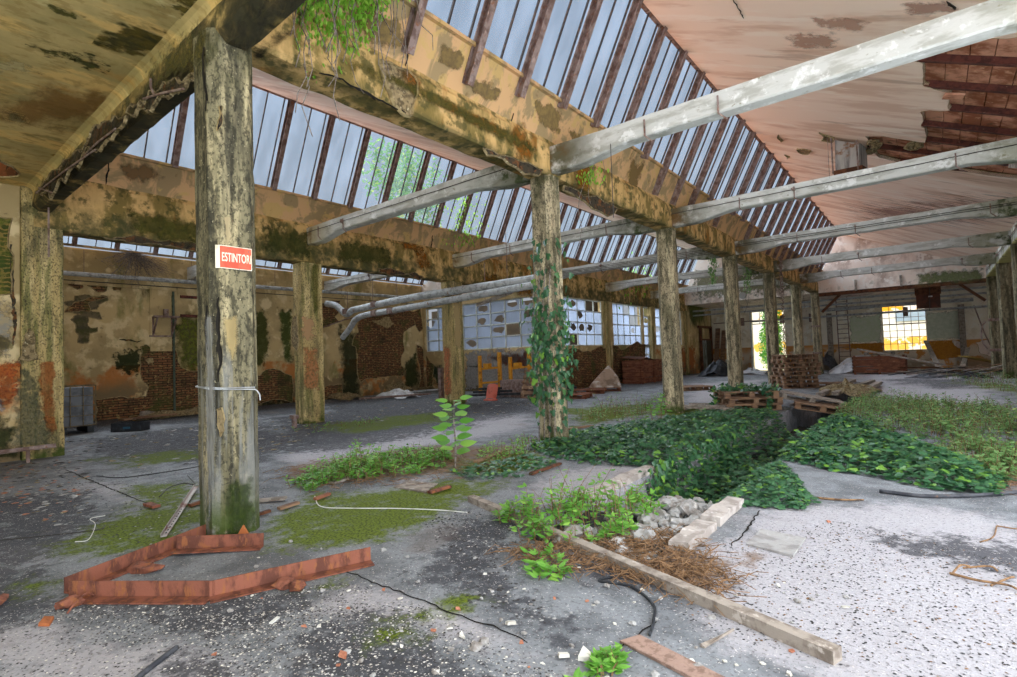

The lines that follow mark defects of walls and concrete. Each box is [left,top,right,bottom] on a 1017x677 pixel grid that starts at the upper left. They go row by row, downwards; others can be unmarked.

leakage [354,4,404,49]
leakage [438,44,464,70]
leakage [794,18,862,48]
spalling [35,72,194,200]
leakage [472,80,501,100]
leakage [535,100,580,139]
spalling [0,160,21,178]
spalling [0,217,56,432]
spalling [64,284,122,344]
spalling [352,302,534,395]
spalling [94,340,198,421]
leakage [206,317,215,507]